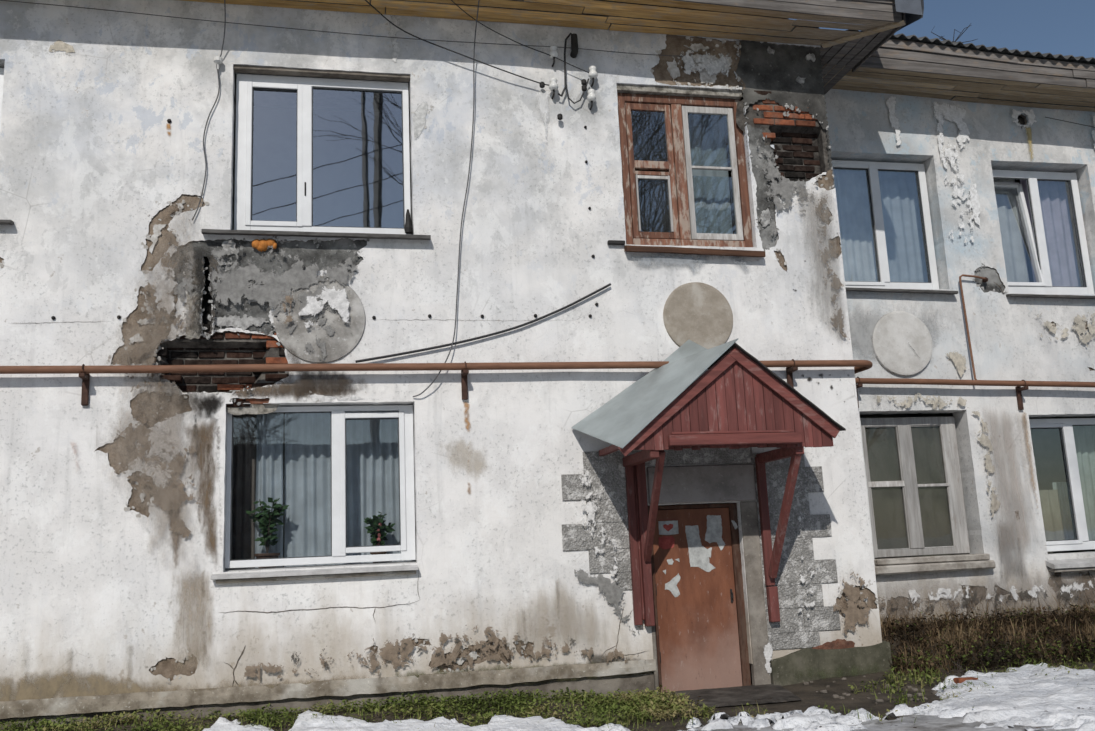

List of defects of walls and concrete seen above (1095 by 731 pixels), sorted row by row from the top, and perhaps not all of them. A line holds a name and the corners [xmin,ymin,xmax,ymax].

peeling [886,96,901,145]
peeling [650,35,850,345]
peeling [932,102,980,243]
peeling [1037,312,1095,347]
peeling [95,191,370,538]
water stain [117,246,216,559]
crack [221,576,420,620]
peeling [833,572,1095,646]
spalling [145,648,200,685]
peeling [244,654,332,685]
peeling [347,625,639,676]